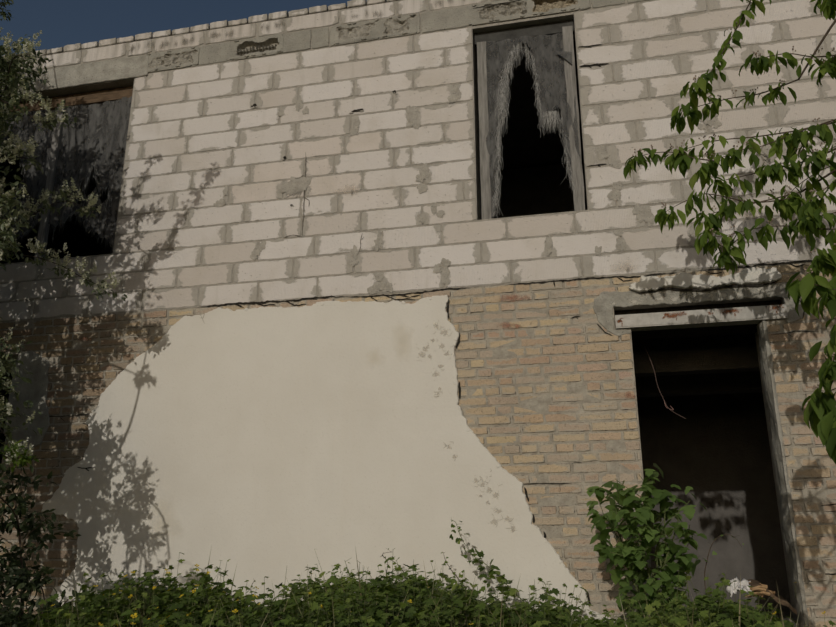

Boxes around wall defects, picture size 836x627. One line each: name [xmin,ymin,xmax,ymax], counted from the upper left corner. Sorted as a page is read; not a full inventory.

spalling [468,0,531,24]
spalling [334,14,417,44]
spalling [230,34,284,59]